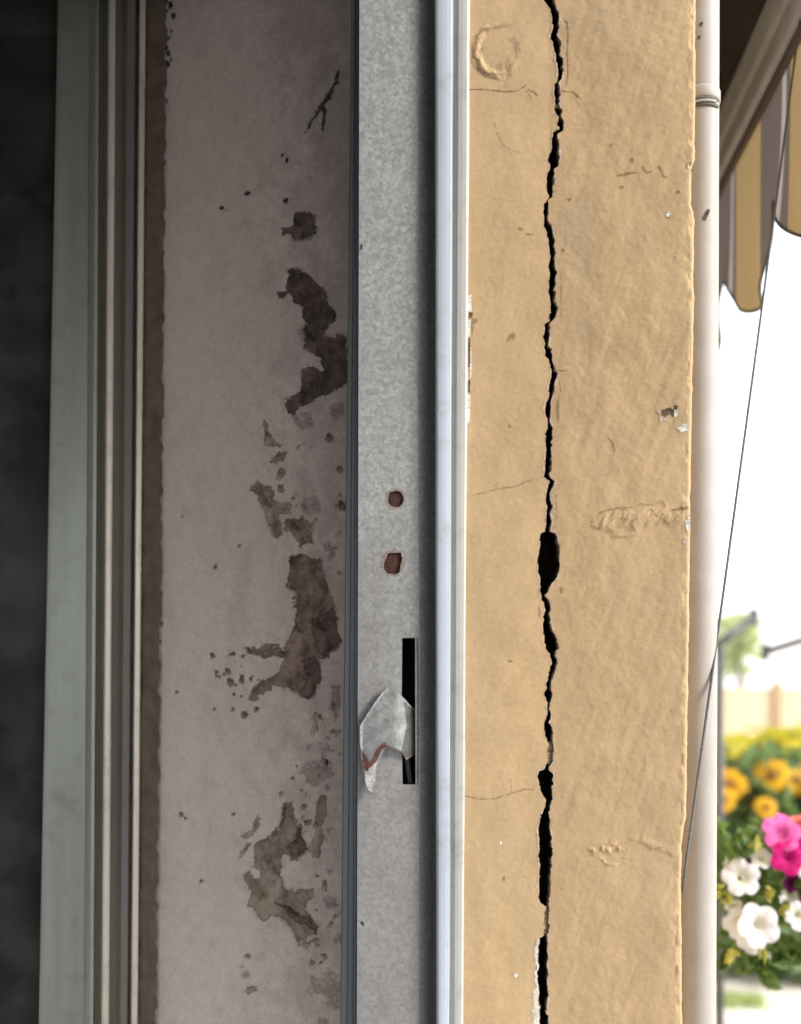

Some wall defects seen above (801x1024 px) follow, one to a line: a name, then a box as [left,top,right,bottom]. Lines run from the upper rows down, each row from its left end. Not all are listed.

flaking render [282,211,317,241]
peeling [277,268,348,415]
peeling [210,420,342,718]
crack [531,0,579,1024]
peeling [238,758,338,966]